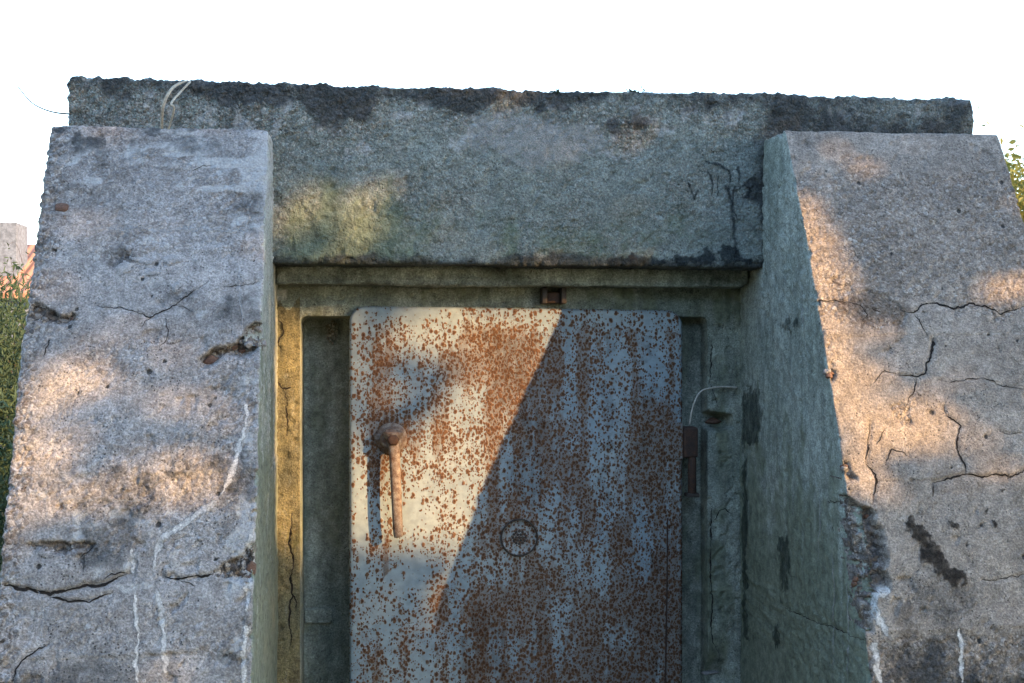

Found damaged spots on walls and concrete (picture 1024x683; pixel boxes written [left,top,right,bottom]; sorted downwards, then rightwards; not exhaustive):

leakage [607,161,764,269]
spalling [28,305,78,326]
spalling [202,323,267,363]
crack [818,299,1024,412]
leakage [152,404,249,569]
crack [866,424,911,505]
crack [933,409,1024,494]
crack [4,546,128,603]
spalling [838,494,888,631]
leakage [905,515,968,588]
leakage [131,590,140,682]
leakage [869,585,891,683]